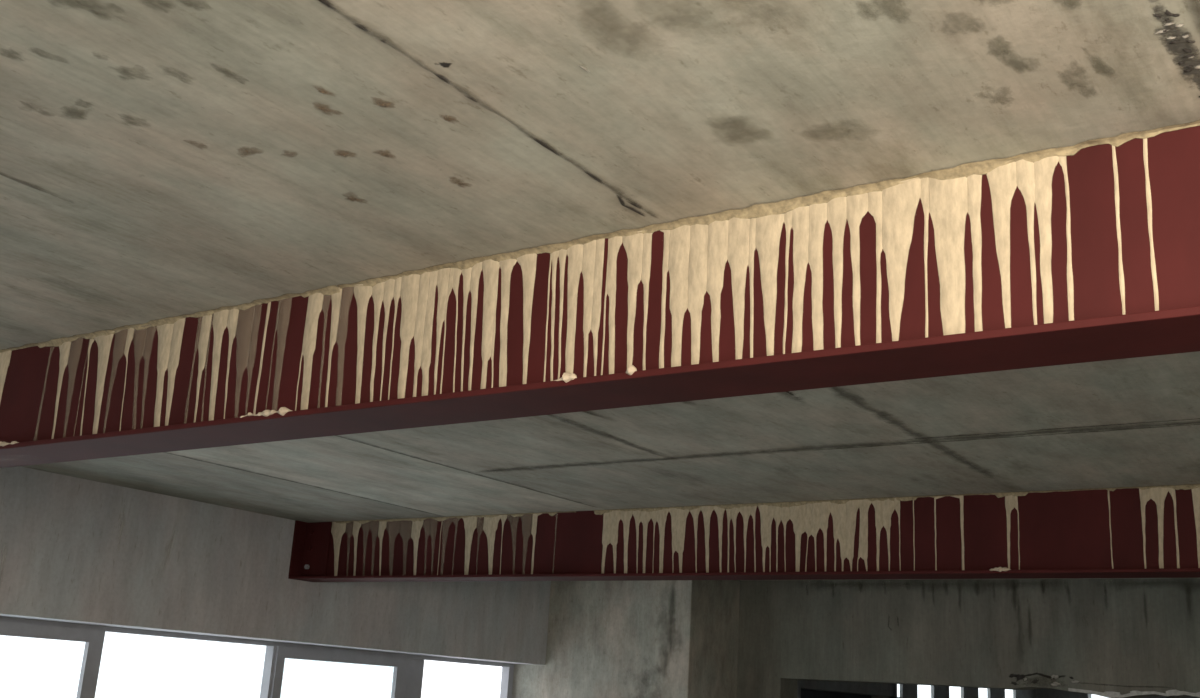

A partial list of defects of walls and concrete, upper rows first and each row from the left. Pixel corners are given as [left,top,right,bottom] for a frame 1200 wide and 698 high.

crack [319,0,655,217]
peeling [1154,10,1200,72]
water stain [0,120,1200,439]